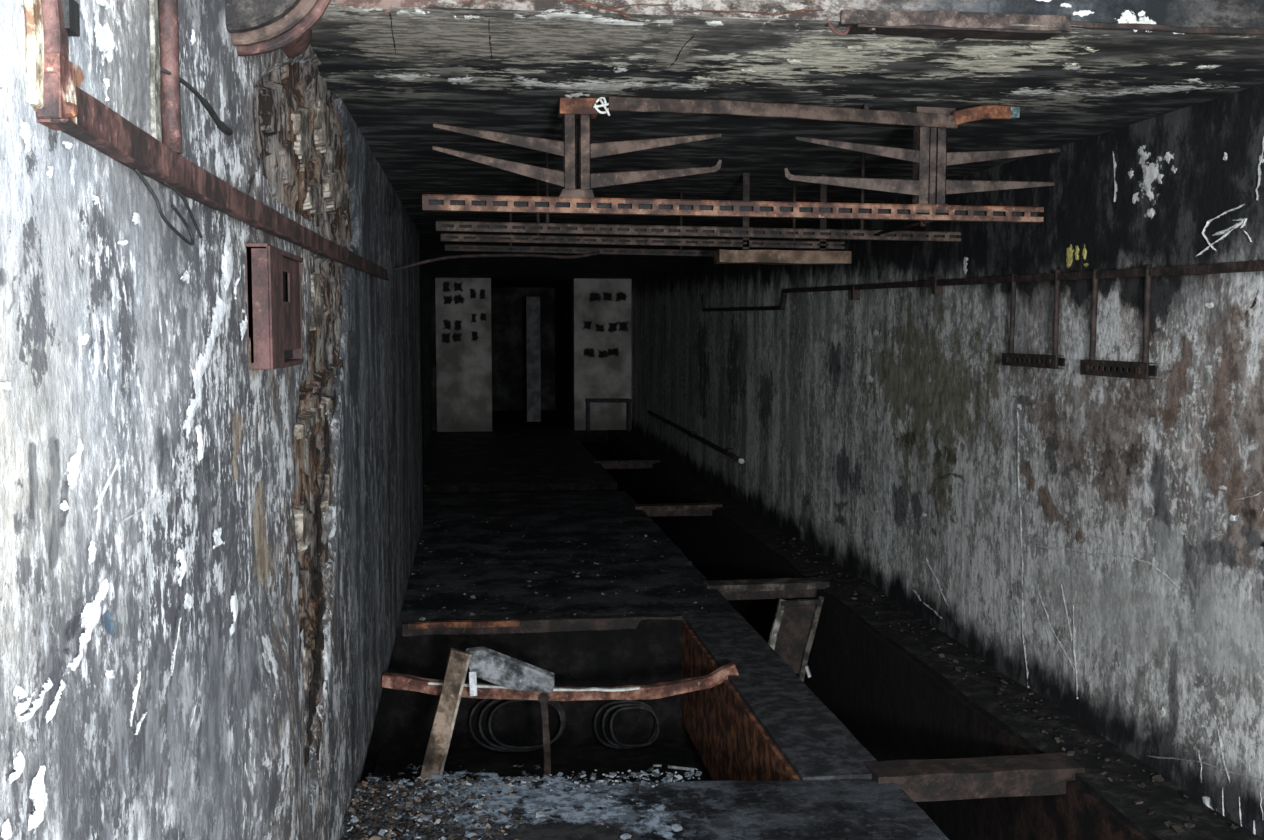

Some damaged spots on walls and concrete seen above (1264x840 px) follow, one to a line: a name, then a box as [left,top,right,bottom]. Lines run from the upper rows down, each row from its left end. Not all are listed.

damp [325,9,708,78]
spalling [254,61,353,247]
peeling [1128,145,1178,219]
rust [1024,333,1195,509]
spalling [292,254,344,747]
rust [1019,459,1085,544]
peeling [1,819,12,840]
peeling [8,751,48,834]